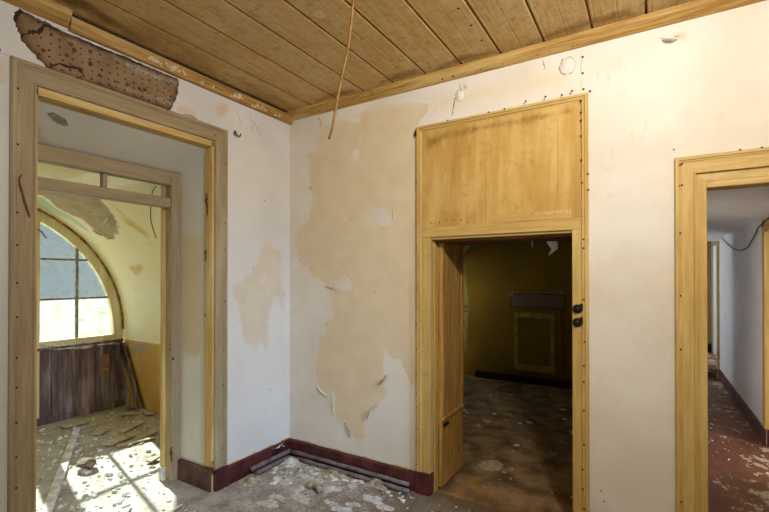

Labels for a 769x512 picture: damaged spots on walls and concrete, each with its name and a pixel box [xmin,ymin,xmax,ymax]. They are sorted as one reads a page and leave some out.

flaking render [38,190,123,241]
peeling [230,238,287,354]
peeling [294,50,587,444]